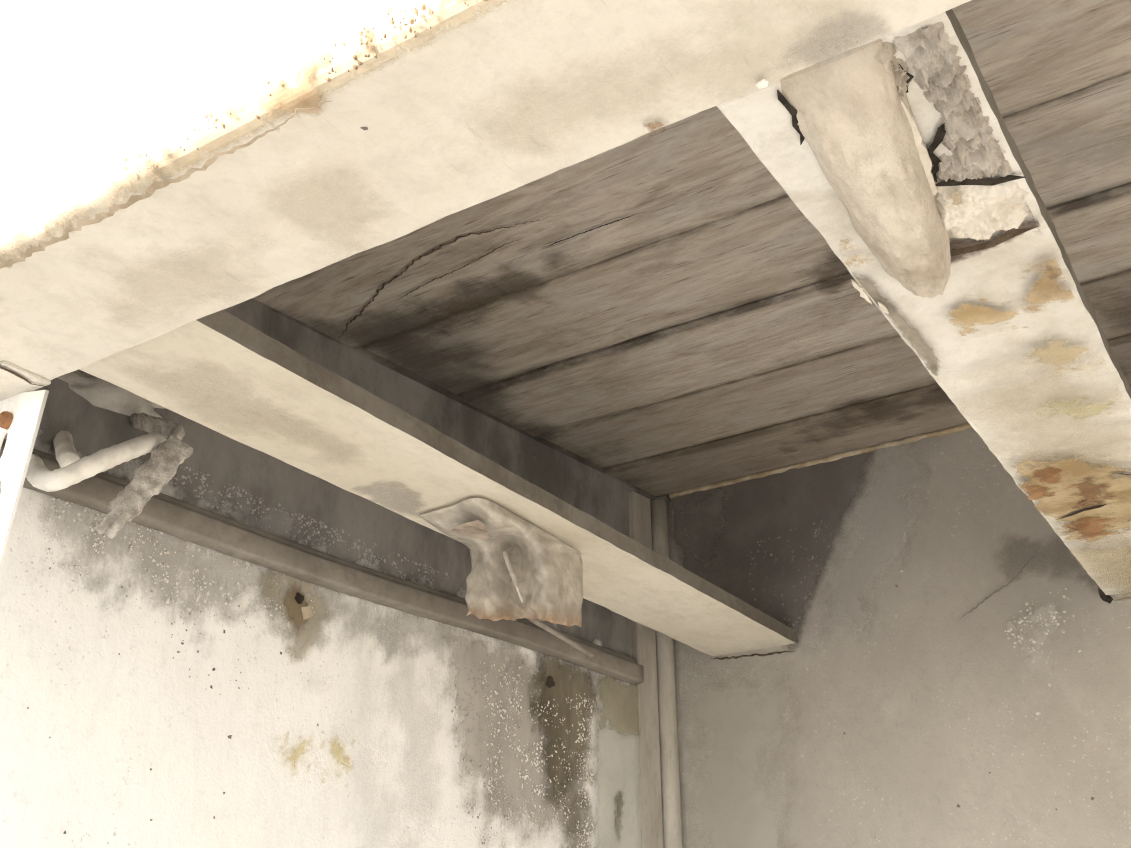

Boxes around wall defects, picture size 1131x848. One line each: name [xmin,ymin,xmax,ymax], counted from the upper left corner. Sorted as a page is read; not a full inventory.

crack [777,90,805,145]
flaking render [874,22,1040,263]
crack [927,123,1026,186]
crack [338,211,646,340]
rust [950,260,1075,336]
crack [0,366,52,390]
leakage [34,378,148,458]
leakage [223,298,656,537]
leakage [154,408,472,596]
peeling [419,498,583,627]
rust [1015,458,1131,542]
leakage [451,635,595,848]